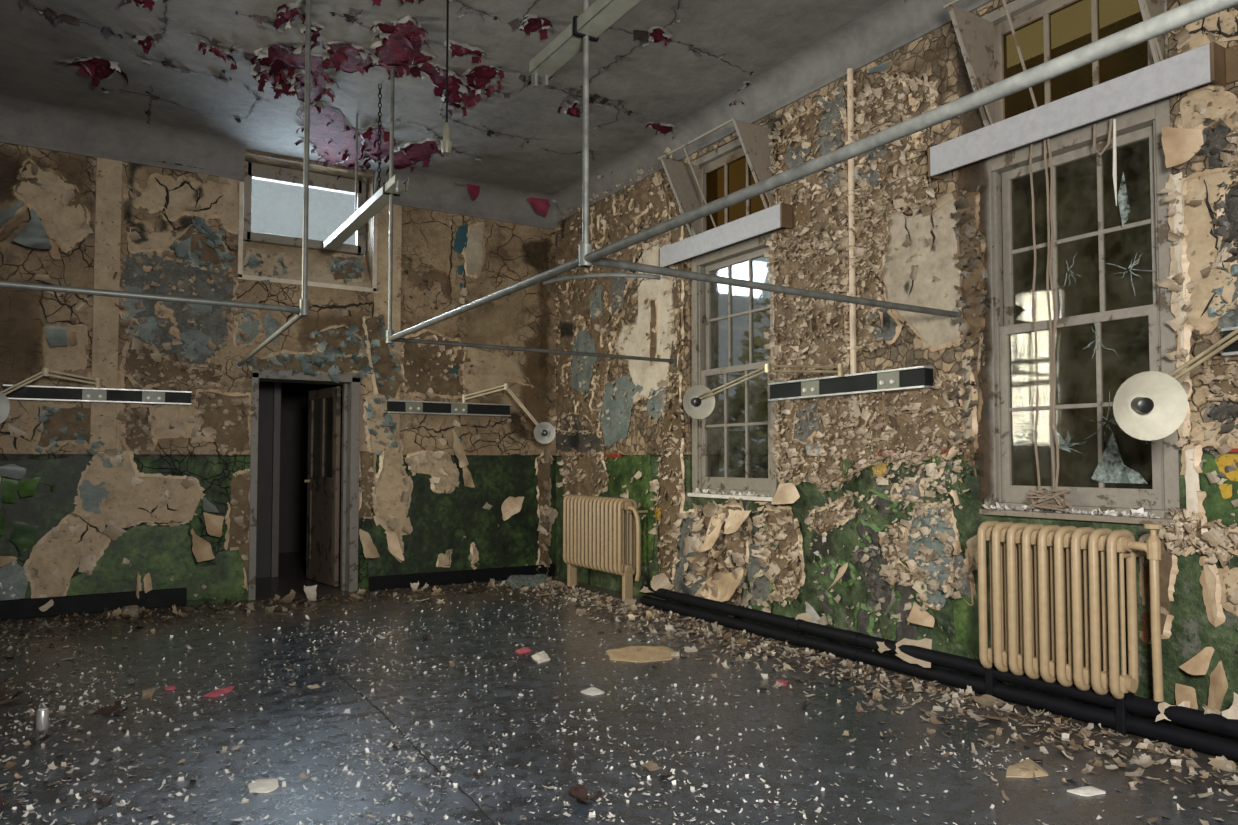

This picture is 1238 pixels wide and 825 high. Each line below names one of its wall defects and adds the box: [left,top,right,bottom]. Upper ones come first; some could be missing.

peeling [117,0,158,11]
peeling [517,14,556,41]
peeling [648,26,673,46]
flaking render [1171,5,1238,54]
peeling [56,56,128,87]
peeling [195,0,504,185]
crack [395,0,755,161]
flaking render [0,157,93,260]
crack [133,177,224,236]
peeling [483,62,991,652]
flaking render [0,173,534,617]
peeling [1175,647,1228,711]